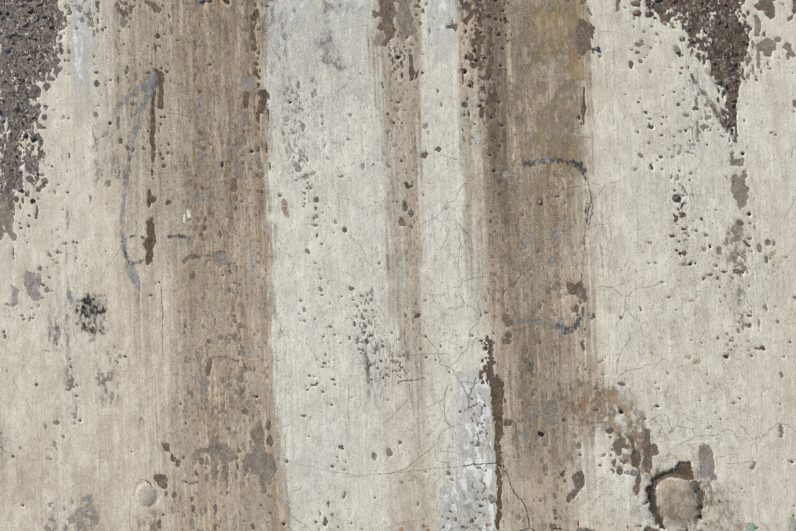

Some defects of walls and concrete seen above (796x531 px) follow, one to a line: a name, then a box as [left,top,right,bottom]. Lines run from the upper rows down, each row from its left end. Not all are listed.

spalling [0,0,107,260]
spalling [93,55,129,118]
water stain [368,0,422,370]
crack [383,133,570,531]
water stain [442,0,716,531]
crack [560,180,621,280]
crack [572,200,793,464]
spalling [614,0,796,302]
spalling [717,285,760,359]